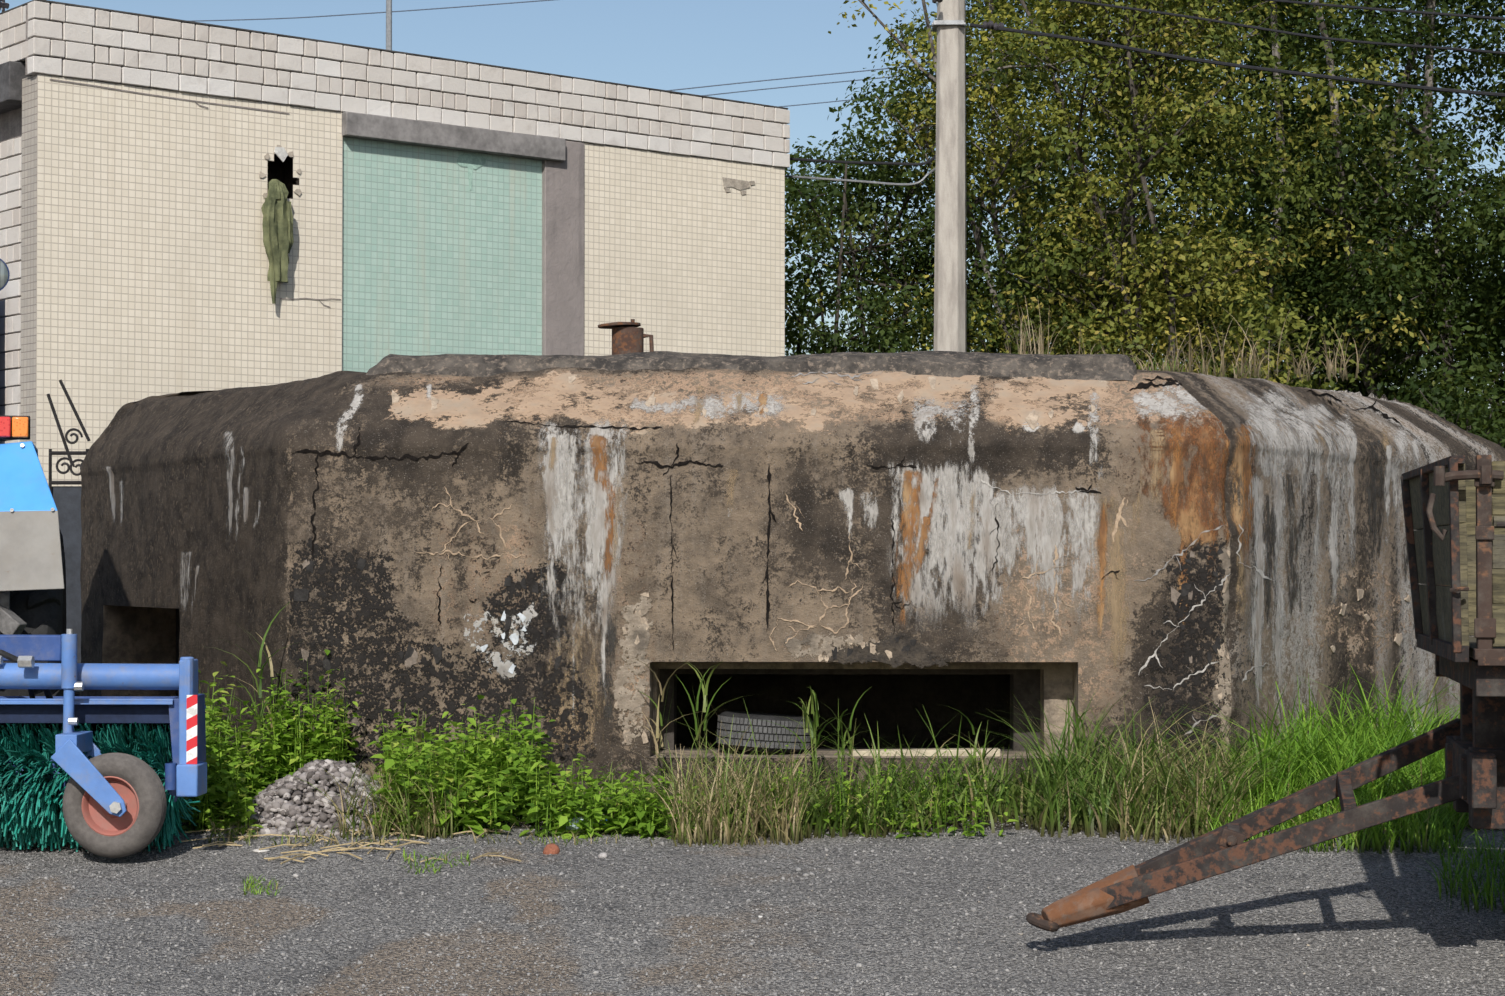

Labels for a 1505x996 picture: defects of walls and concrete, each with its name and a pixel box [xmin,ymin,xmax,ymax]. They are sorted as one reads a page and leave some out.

spalling [259,145,302,208]
peeling [287,537,596,779]
damp [539,420,626,749]
corrosion [590,435,618,577]
crack [508,419,723,649]
spalling [612,592,655,745]
crack [762,466,912,651]
corrosion [897,470,937,622]
damp [839,385,1100,614]
crack [980,476,1275,735]
corrosion [1133,411,1256,625]
damp [1249,401,1357,707]